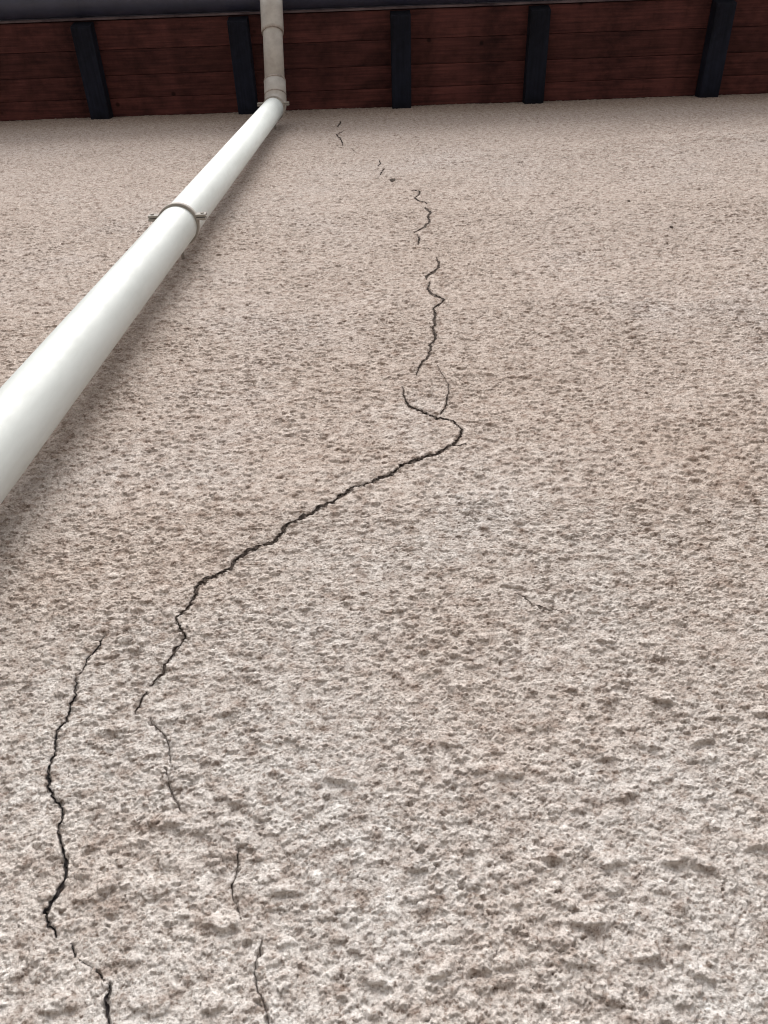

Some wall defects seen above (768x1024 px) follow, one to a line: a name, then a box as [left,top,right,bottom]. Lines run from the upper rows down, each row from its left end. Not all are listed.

crack [135,190,466,800]
crack [43,635,111,1024]